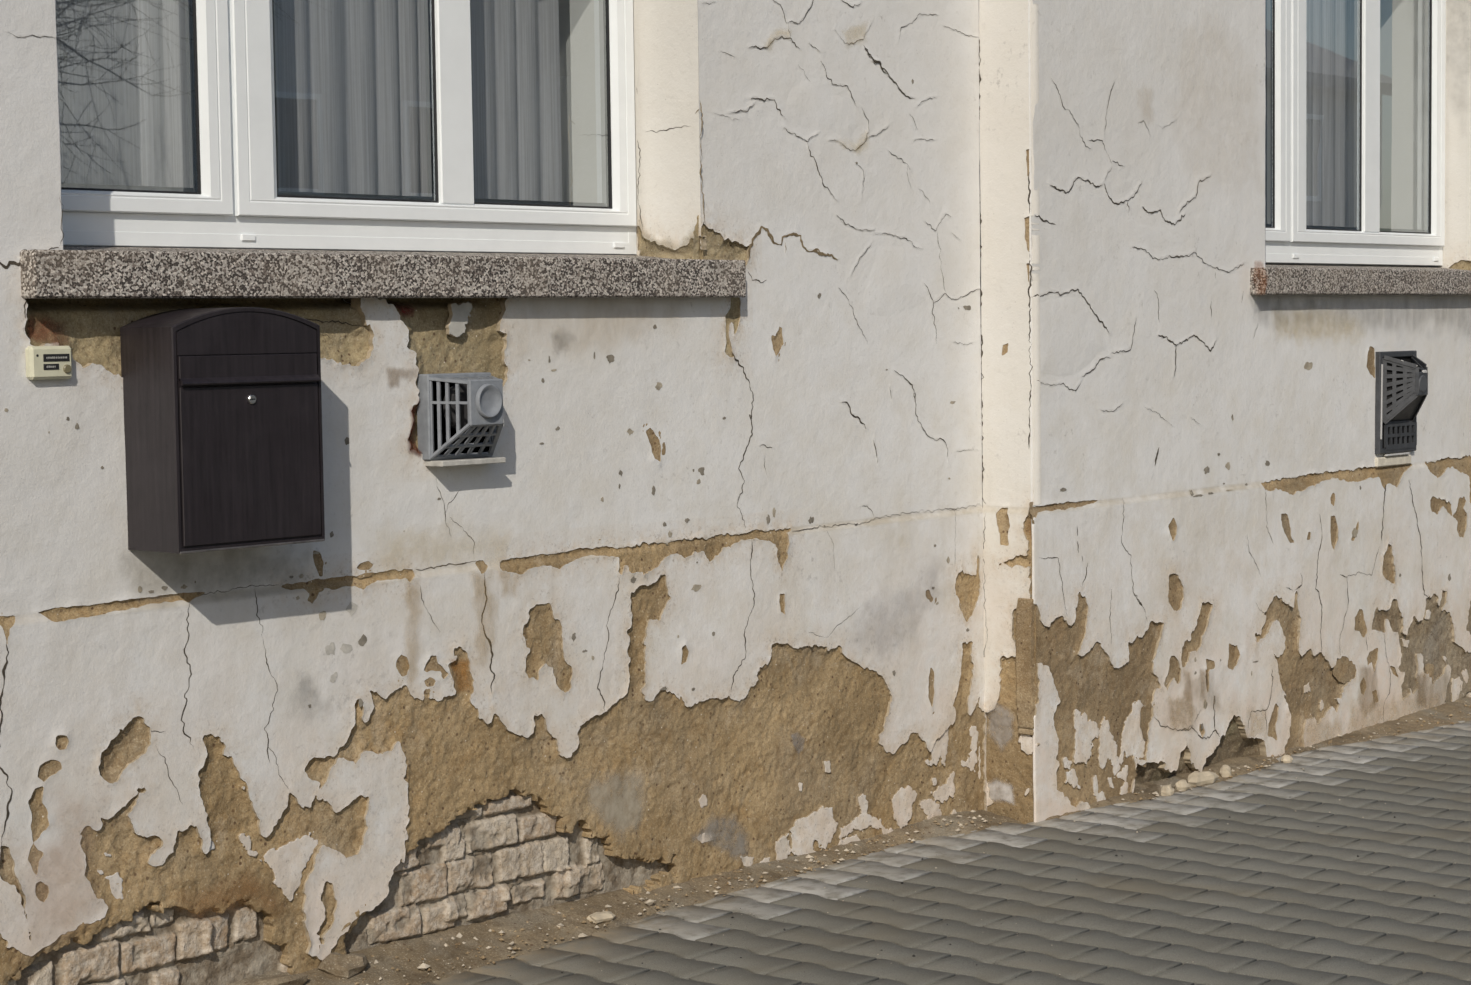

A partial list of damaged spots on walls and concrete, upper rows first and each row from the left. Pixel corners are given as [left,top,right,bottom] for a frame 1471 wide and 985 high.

flaking render [25,298,508,386]
crack [637,1,987,689]
crack [1028,80,1258,465]
flaking render [408,404,418,451]
crack [1043,505,1146,644]
crack [1247,482,1428,719]
crack [0,644,9,732]
crack [152,585,288,803]
flaking render [0,488,1471,985]
crack [1155,671,1273,739]
crack [0,767,12,851]